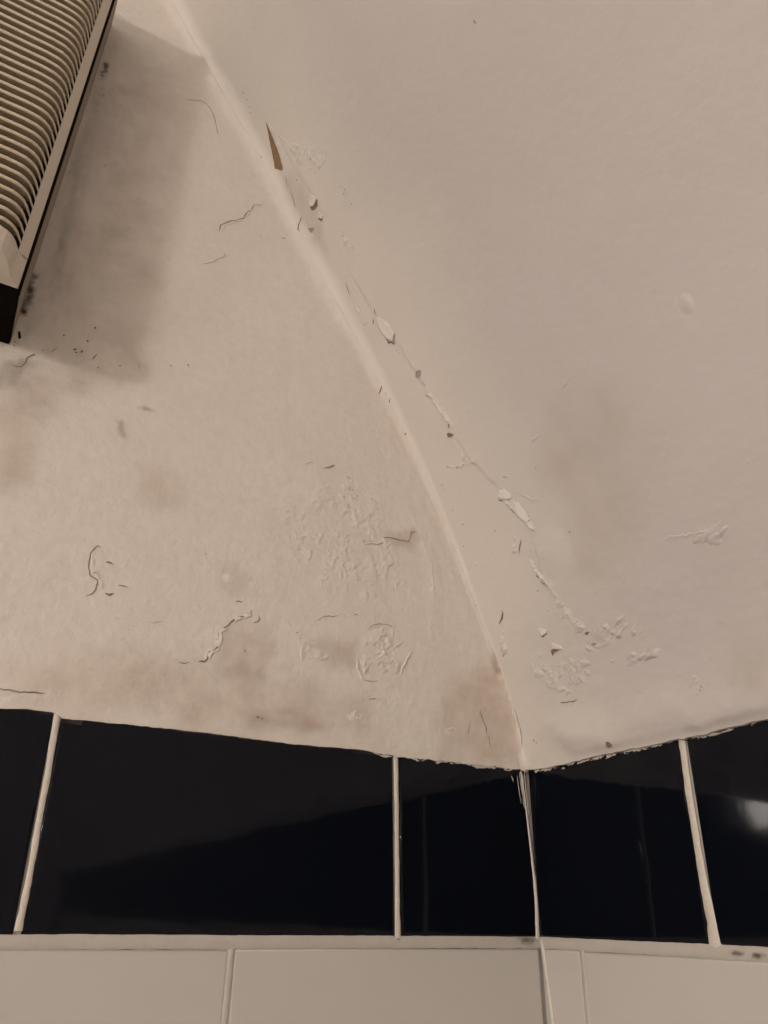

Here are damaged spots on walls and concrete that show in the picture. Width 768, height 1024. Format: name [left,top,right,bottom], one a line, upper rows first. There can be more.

crack [204,204,258,264]
flaking render [307,194,324,236]